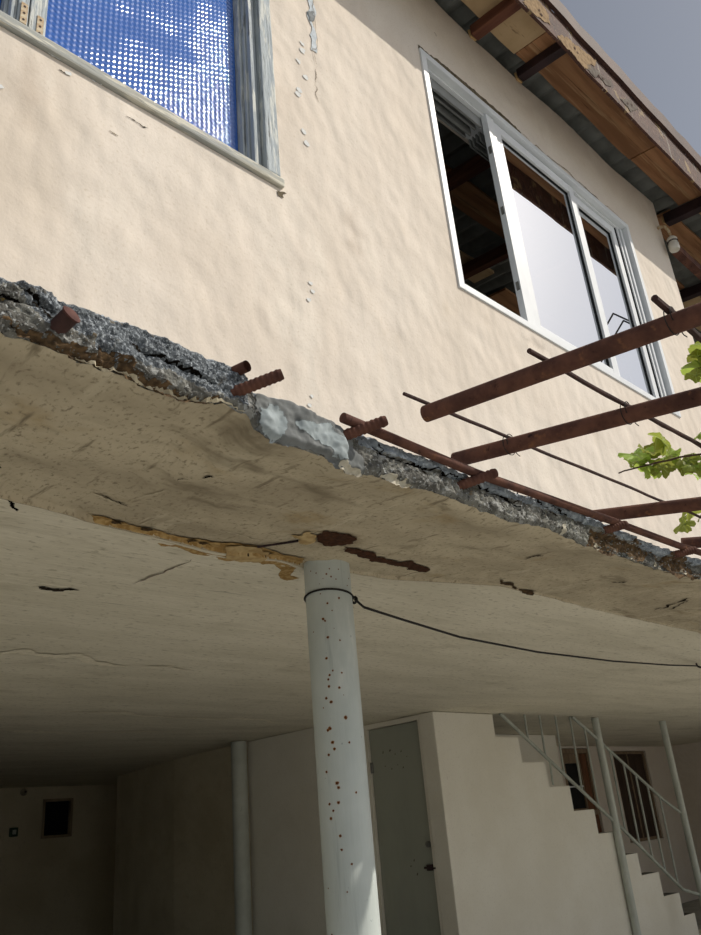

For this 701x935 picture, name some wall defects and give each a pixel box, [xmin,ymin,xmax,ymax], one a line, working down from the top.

spalling [0,315,244,412]